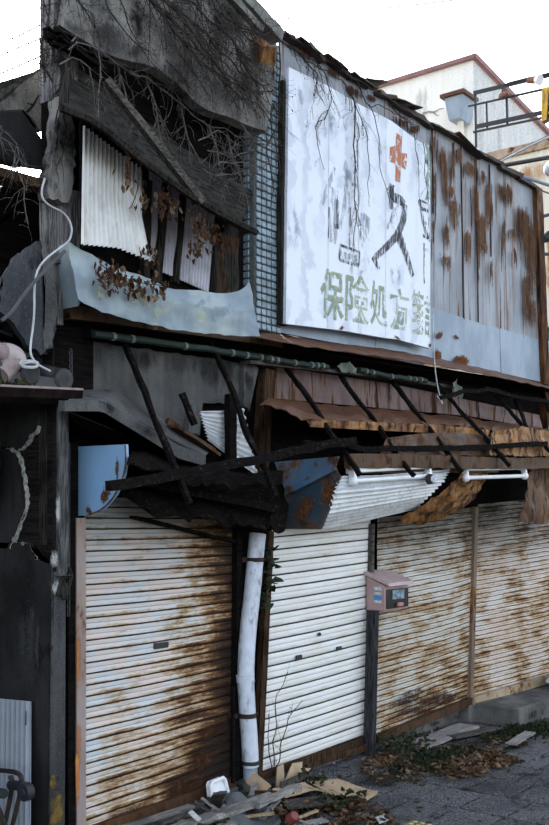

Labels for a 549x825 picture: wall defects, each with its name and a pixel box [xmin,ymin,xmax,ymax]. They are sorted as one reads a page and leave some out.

corrosion [431,136,541,333]
corrosion [296,484,333,520]
corrosion [390,688,459,720]